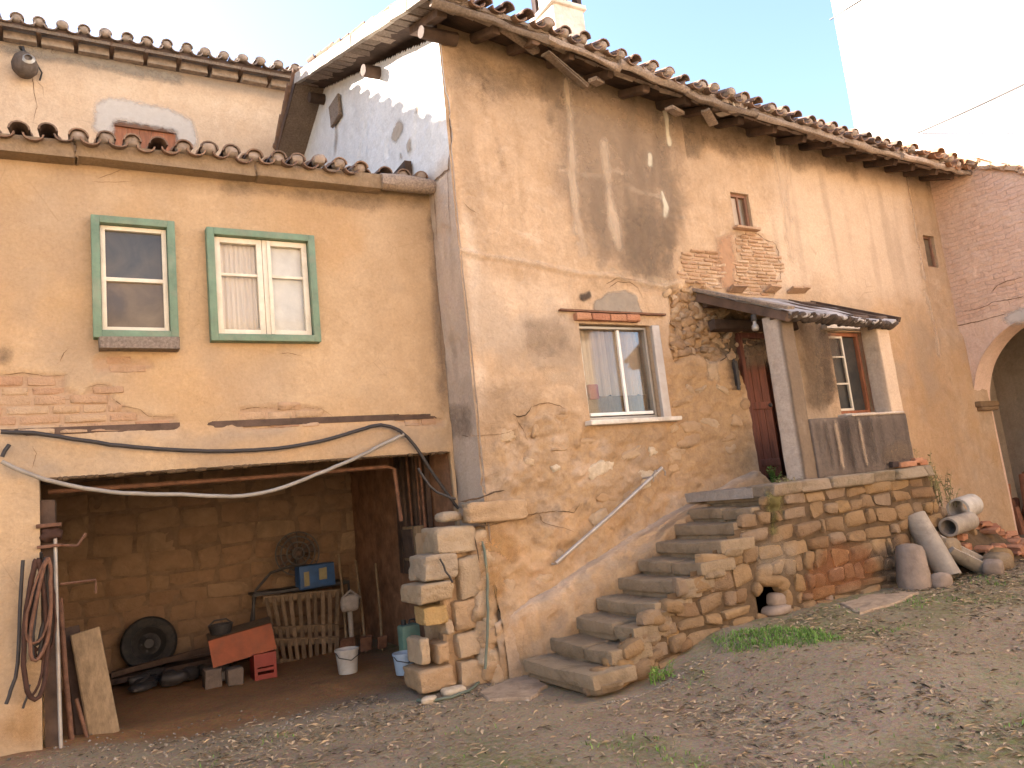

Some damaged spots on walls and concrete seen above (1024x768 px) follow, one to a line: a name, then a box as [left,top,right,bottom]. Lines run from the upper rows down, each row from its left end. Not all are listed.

leakage [550,72,802,278]
spalling [662,233,785,362]
flaking render [0,373,171,434]
crack [462,402,563,439]
crack [461,490,577,560]